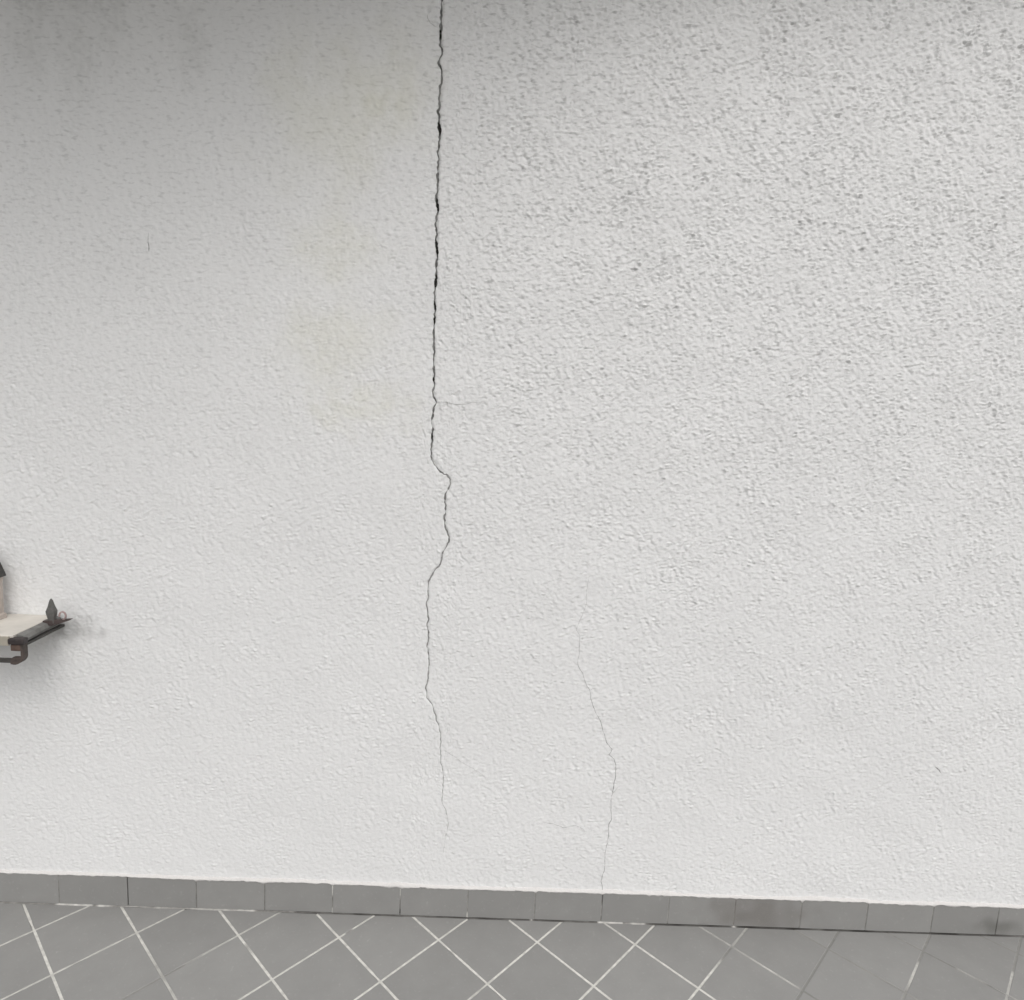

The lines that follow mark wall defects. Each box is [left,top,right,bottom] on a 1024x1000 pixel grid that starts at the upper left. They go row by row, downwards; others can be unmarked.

crack [425,0,491,851]